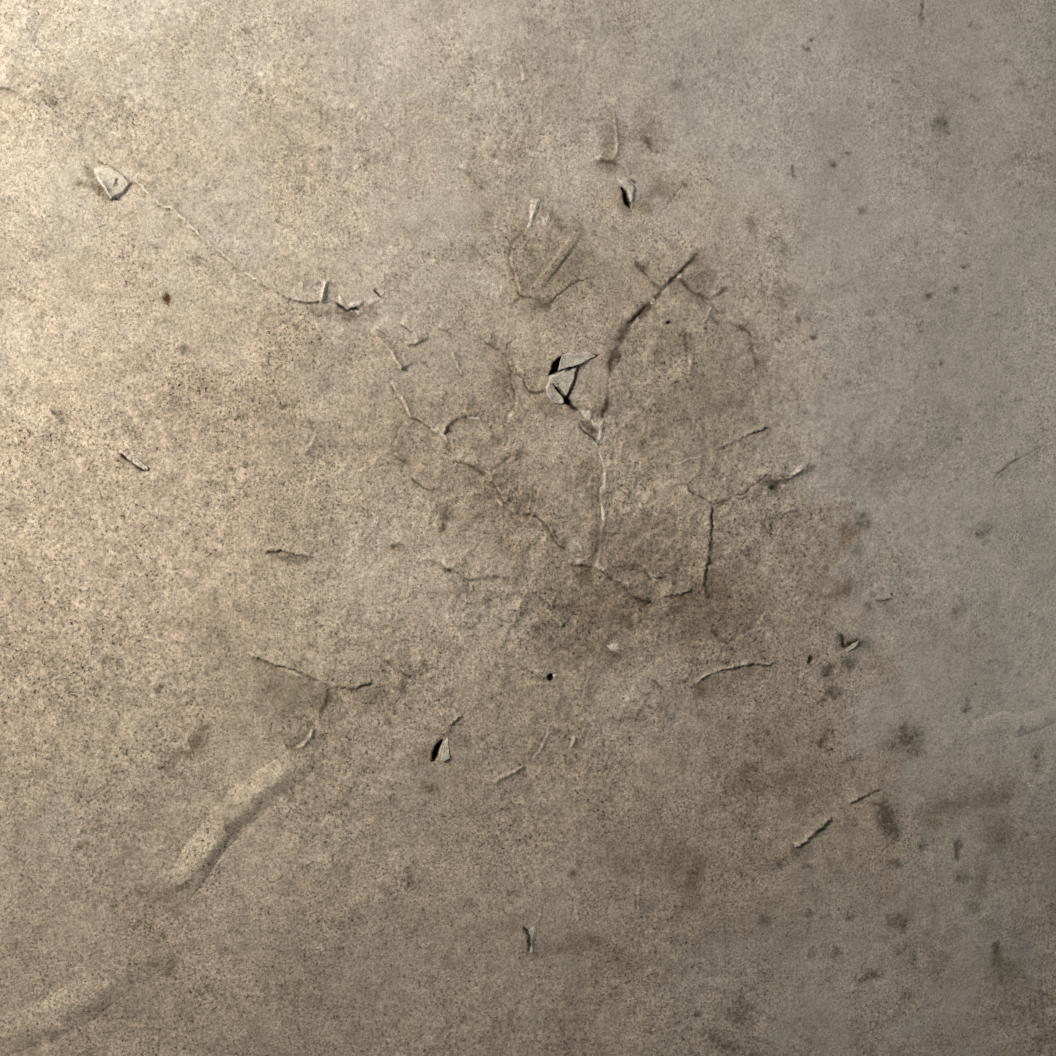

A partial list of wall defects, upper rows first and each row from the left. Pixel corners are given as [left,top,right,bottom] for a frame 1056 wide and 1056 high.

flaking render [78,162,388,320]
crack [509,199,592,305]
crack [609,254,726,371]
crack [378,328,480,442]
crack [485,338,544,398]
flaking render [546,352,611,449]
crack [470,453,790,622]
crack [695,631,771,696]
crack [286,689,332,748]
damp [876,802,898,835]